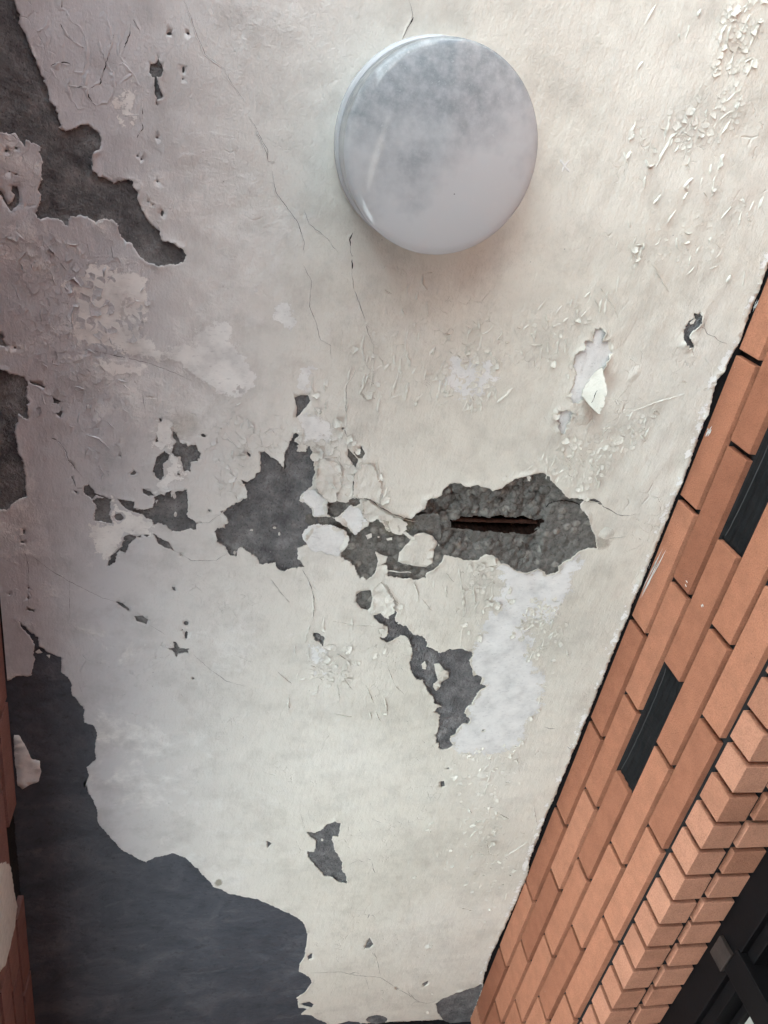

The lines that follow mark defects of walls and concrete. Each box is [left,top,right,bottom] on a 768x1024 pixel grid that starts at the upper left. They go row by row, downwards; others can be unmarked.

peeling [623,0,768,200]
peeling [0,0,260,399]
crack [184,2,374,448]
peeling [615,197,764,292]
peeling [684,313,702,348]
peeling [0,370,45,510]
peeling [75,407,206,566]
spalling [208,276,684,756]
peeling [117,602,148,624]
peeling [5,621,327,1024]
peeling [307,822,347,883]
peeling [436,984,484,1023]